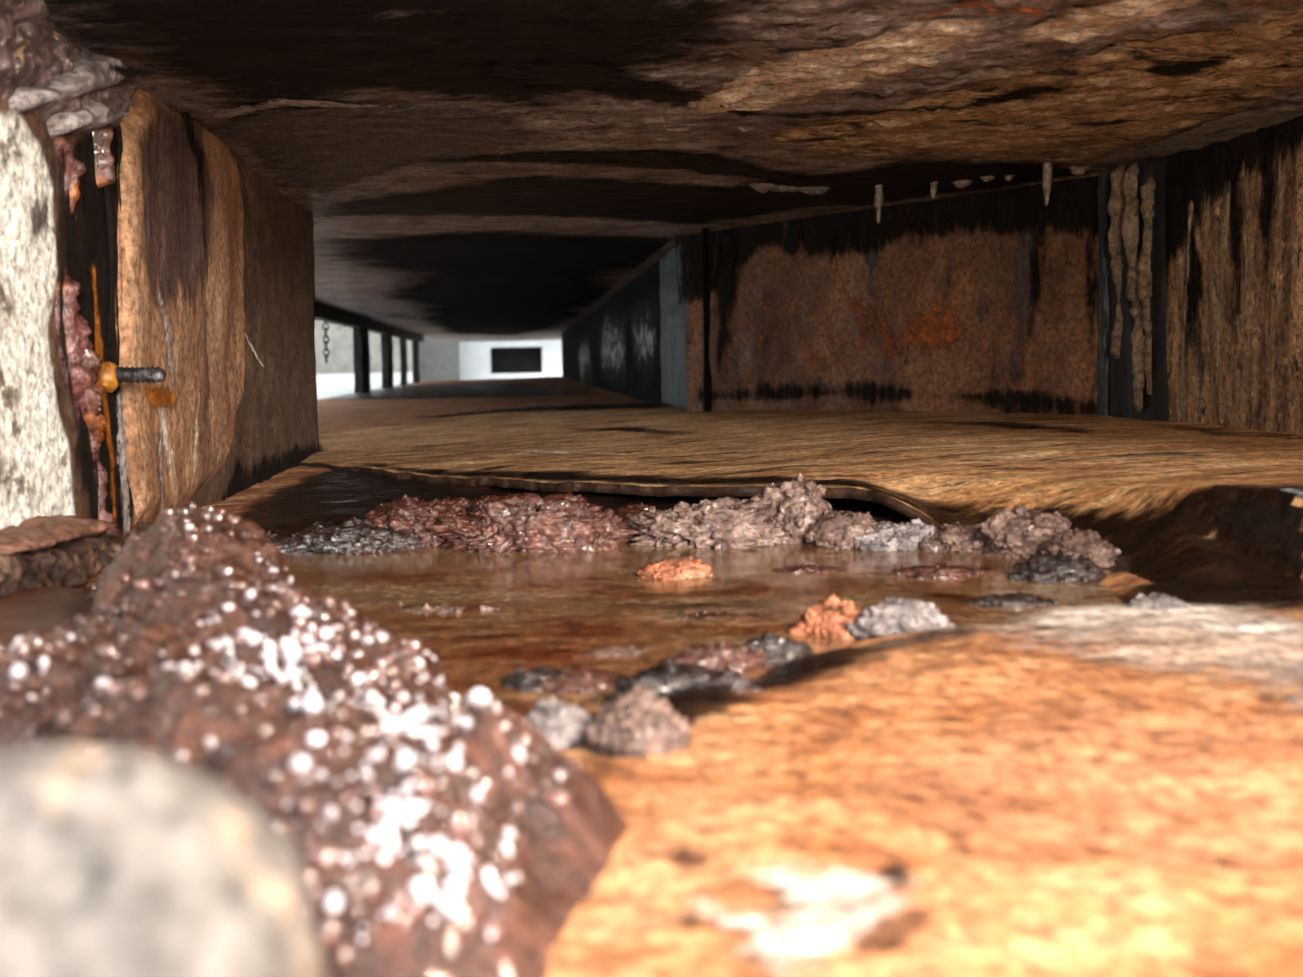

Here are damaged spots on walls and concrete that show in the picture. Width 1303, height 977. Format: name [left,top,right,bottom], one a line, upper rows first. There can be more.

leakage [45,0,1086,119]
leakage [141,106,214,383]
leakage [322,115,1303,437]
rust [55,267,131,537]
leakage [223,442,794,535]
leakage [654,479,1303,719]
leakage [575,737,631,765]